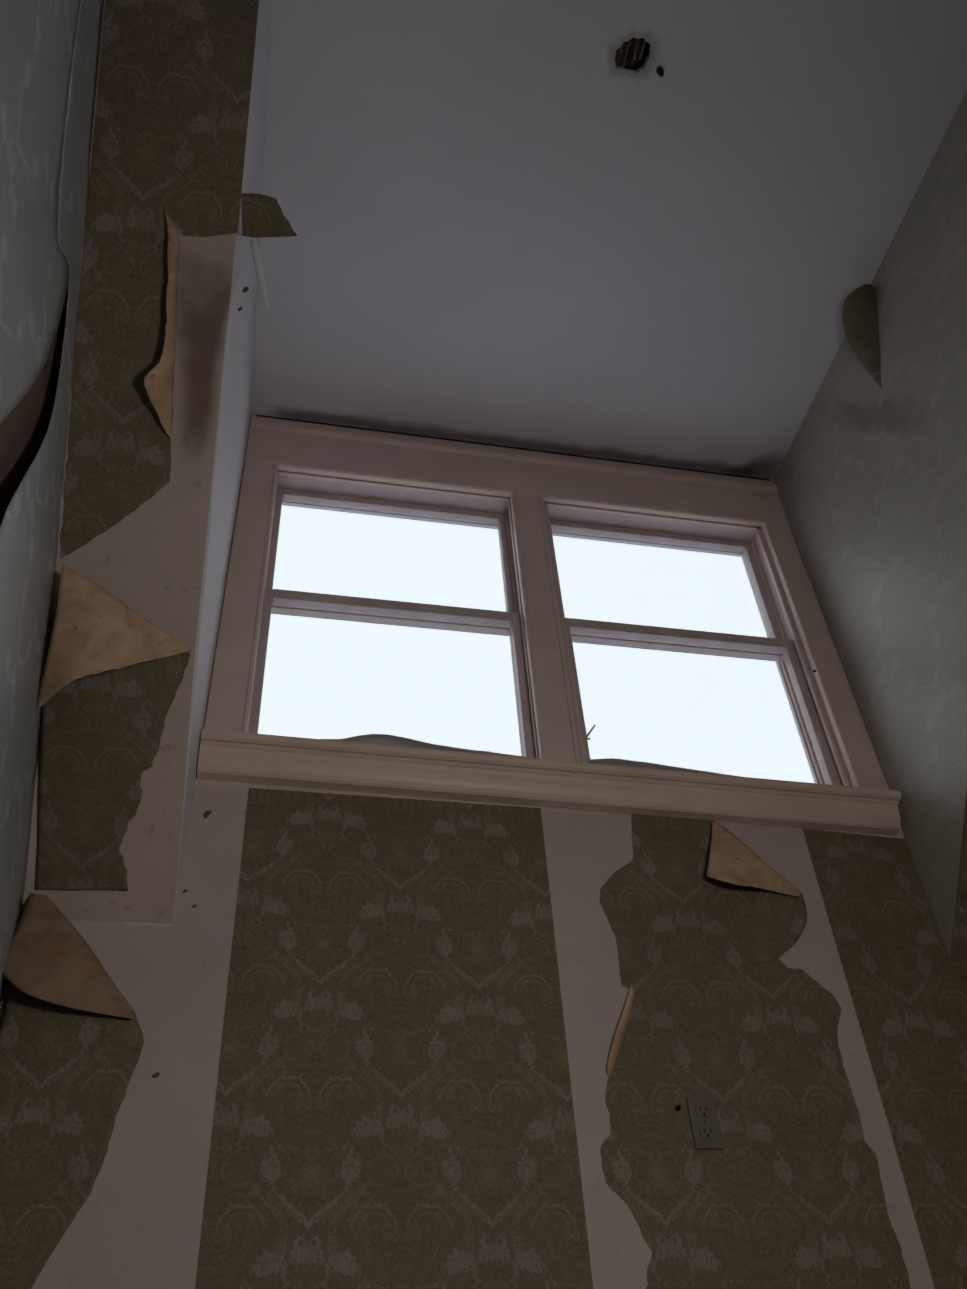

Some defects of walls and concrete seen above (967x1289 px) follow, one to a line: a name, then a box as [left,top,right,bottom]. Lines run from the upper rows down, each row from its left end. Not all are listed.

flaking render [32,221,249,1289]
flaking render [541,811,652,1289]
flaking render [717,822,935,1289]